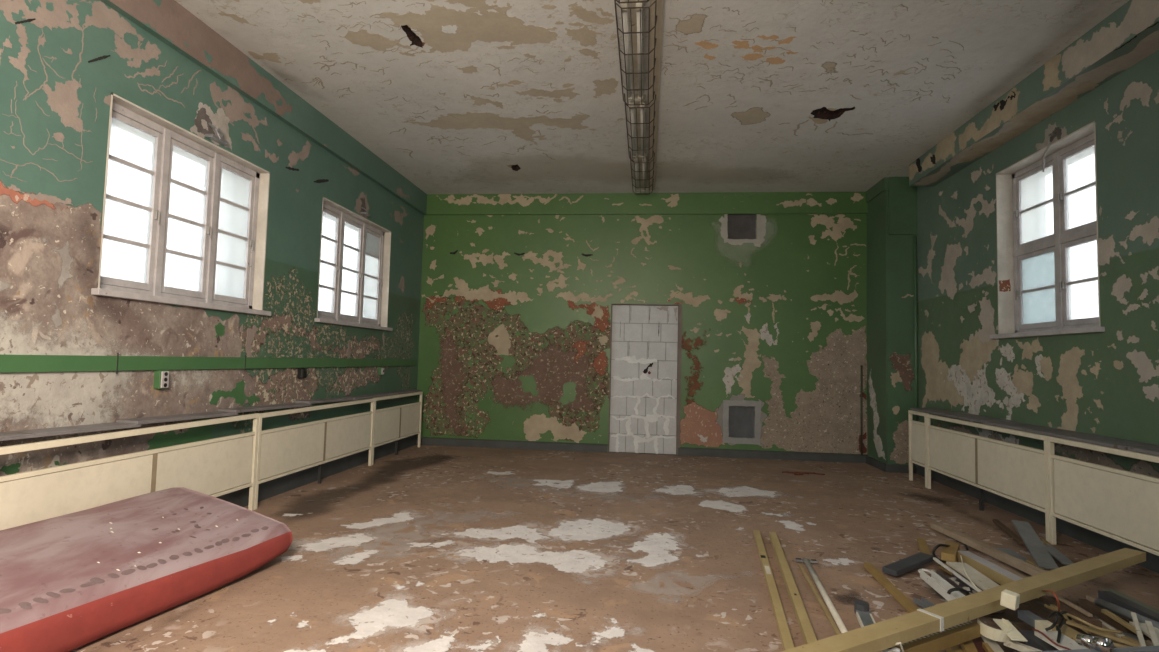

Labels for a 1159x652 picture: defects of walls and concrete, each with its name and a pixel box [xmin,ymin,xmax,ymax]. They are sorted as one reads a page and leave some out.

peeling [340,0,614,62]
crack [0,99,97,182]
crack [124,43,202,107]
peeling [0,0,327,168]
peeling [401,78,618,147]
peeling [667,0,1159,483]
peeling [0,181,680,482]
peeling [532,479,579,490]
peeling [407,540,455,548]